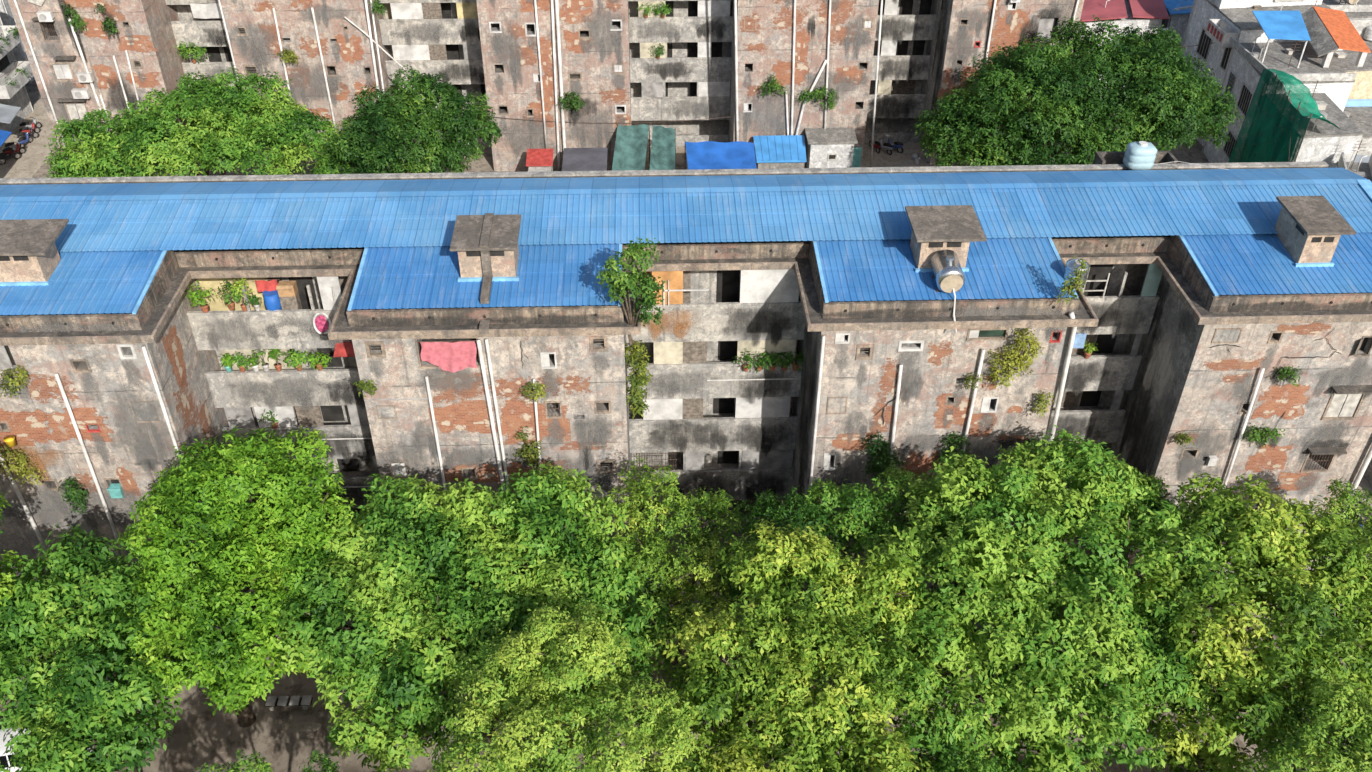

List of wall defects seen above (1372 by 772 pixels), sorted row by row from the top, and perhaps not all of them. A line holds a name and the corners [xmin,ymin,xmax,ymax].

flaking render [509,0,622,127]
water stain [648,63,686,79]
water stain [697,22,724,40]
flaking render [739,0,856,97]
water stain [808,0,1071,126]
flaking render [0,374,116,447]
flaking render [424,371,612,490]
water stain [651,309,862,504]
flaking render [832,358,910,451]
flaking render [932,374,1034,443]
water stain [972,414,1100,477]
water stain [1058,364,1108,395]